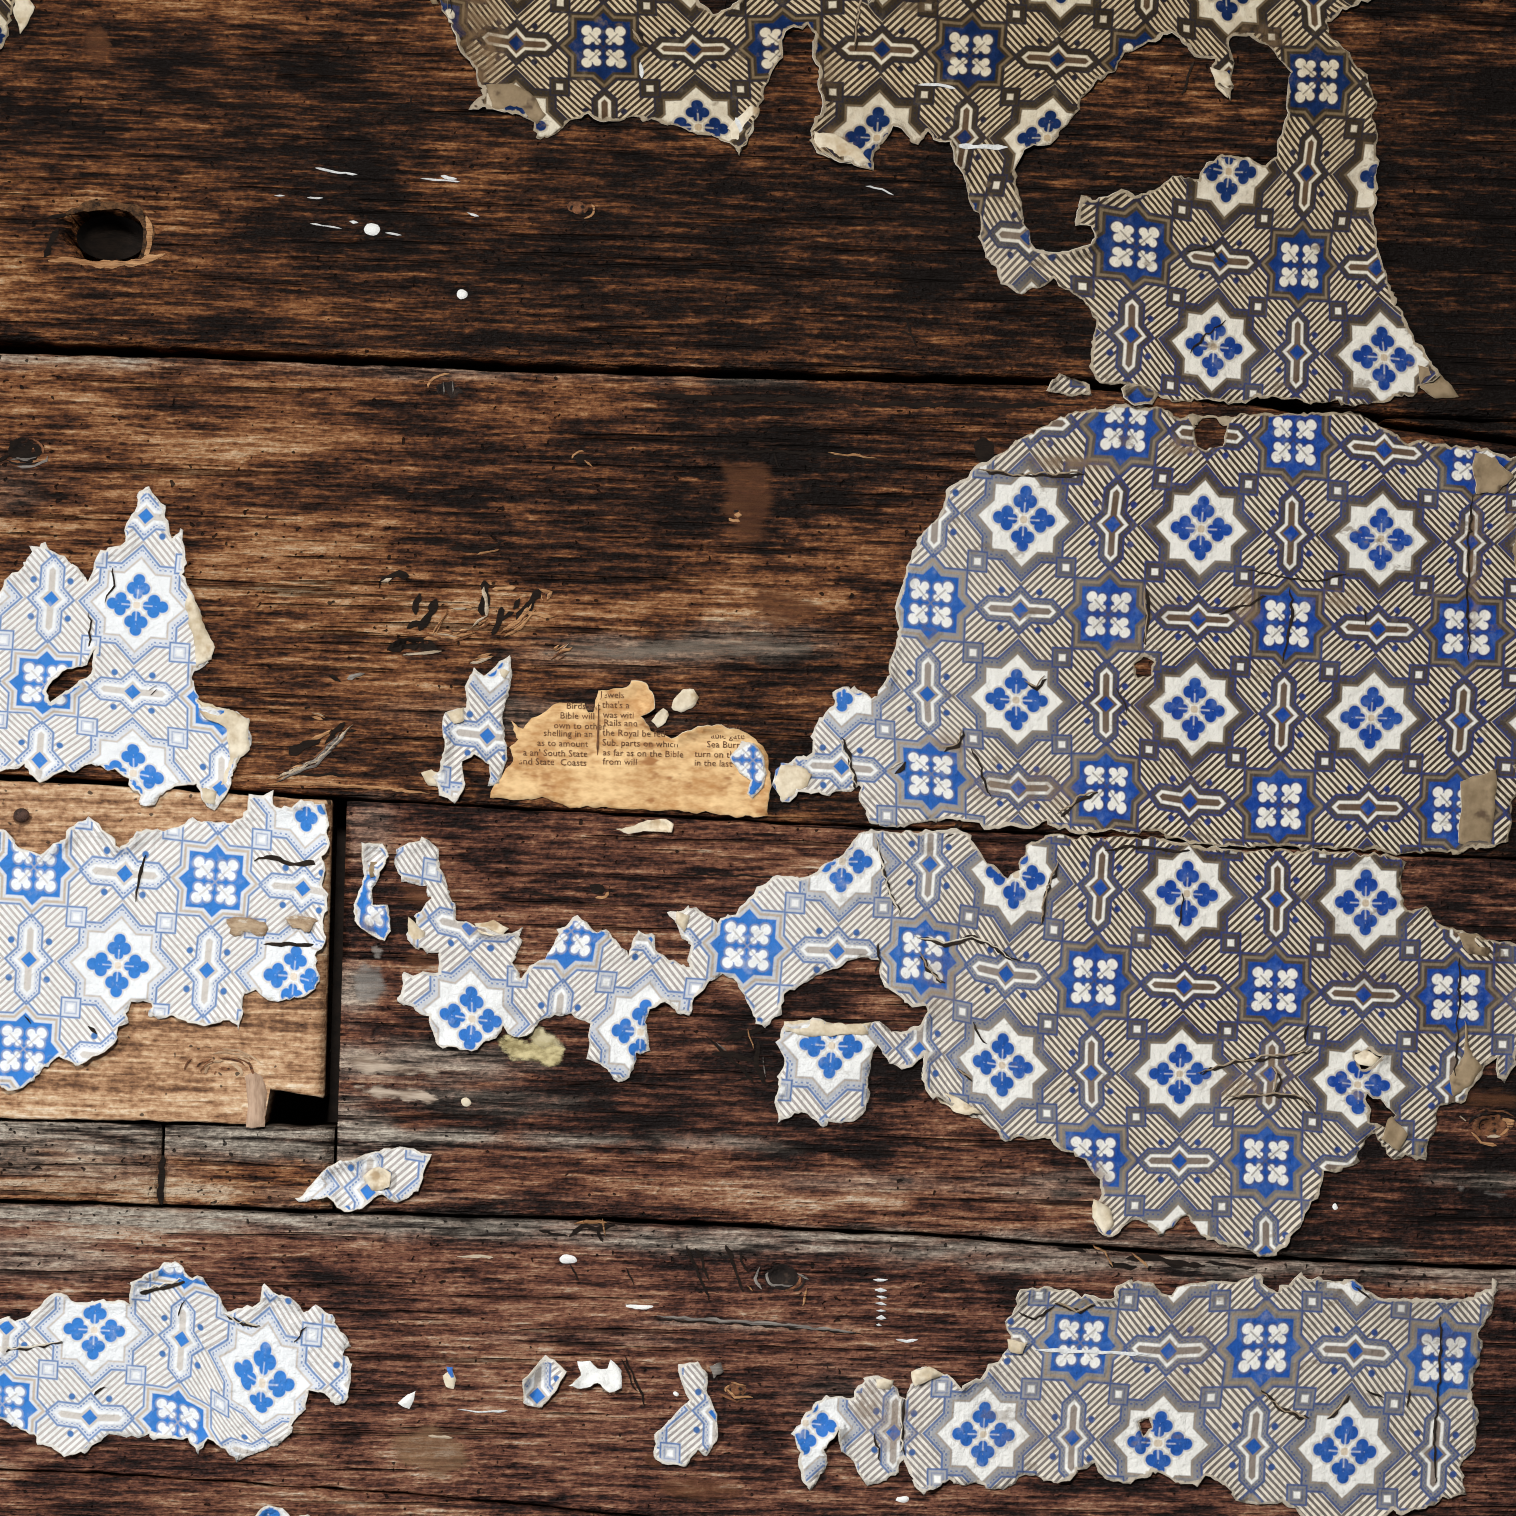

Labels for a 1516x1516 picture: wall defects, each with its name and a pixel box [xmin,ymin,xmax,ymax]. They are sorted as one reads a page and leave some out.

spalling [380,570,409,583]
spalling [387,580,554,655]
spalling [471,653,494,664]
spalling [551,644,572,660]
peeling [652,689,699,728]
peeling [348,1051,439,1103]